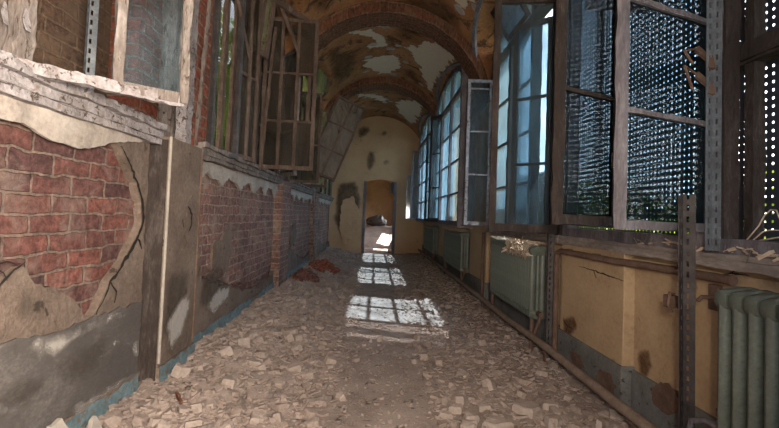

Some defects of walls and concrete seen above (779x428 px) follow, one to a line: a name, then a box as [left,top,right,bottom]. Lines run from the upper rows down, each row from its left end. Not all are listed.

peeling [348,26,454,92]
peeling [357,93,423,126]
flaking render [202,160,278,198]
flaking render [0,94,143,315]
damp [335,183,360,230]
crack [96,146,145,315]
crack [0,261,25,287]
peeling [160,283,274,382]
corrosion [639,353,650,376]